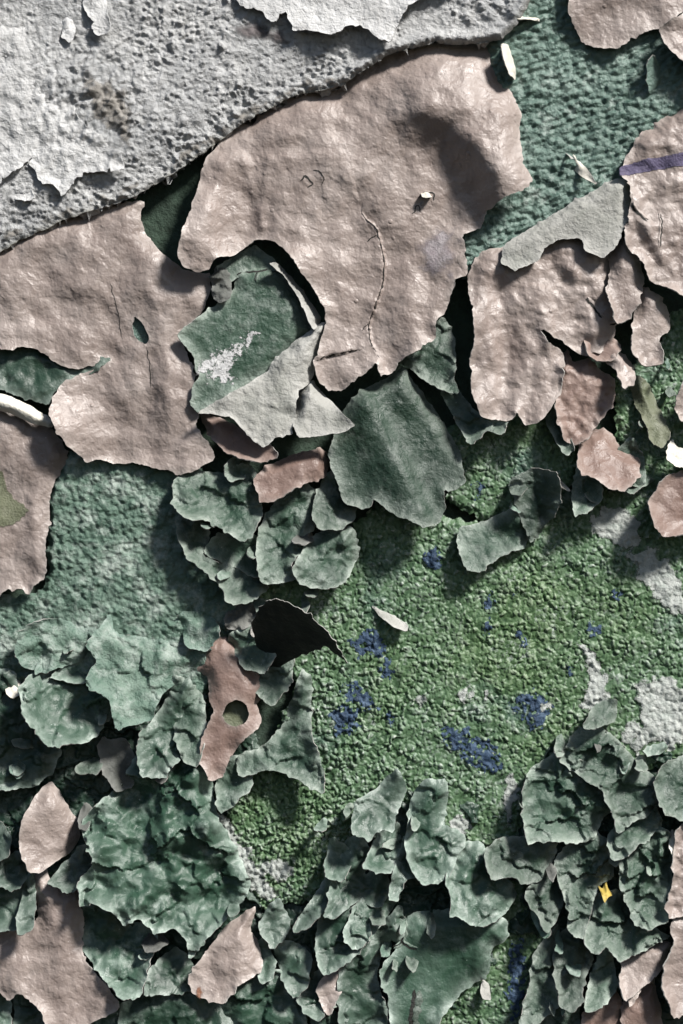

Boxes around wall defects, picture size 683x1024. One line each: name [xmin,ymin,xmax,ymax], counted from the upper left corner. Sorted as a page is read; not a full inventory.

peeling [82,0,111,36]
peeling [237,0,418,43]
peeling [0,25,124,201]
peeling [565,153,597,185]
peeling [623,109,683,166]
peeling [0,200,360,612]
crack [317,208,385,361]
peeling [177,43,533,528]
peeling [441,166,683,521]
peeling [0,287,683,1024]